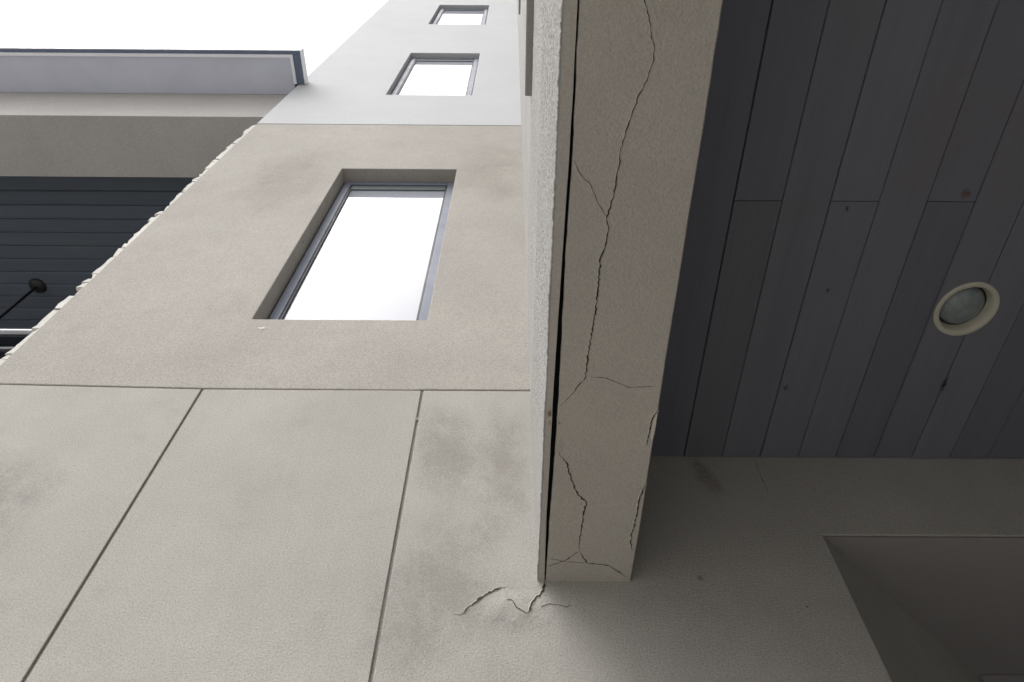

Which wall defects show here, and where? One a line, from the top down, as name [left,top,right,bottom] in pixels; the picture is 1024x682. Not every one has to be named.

crack [454,0,659,615]